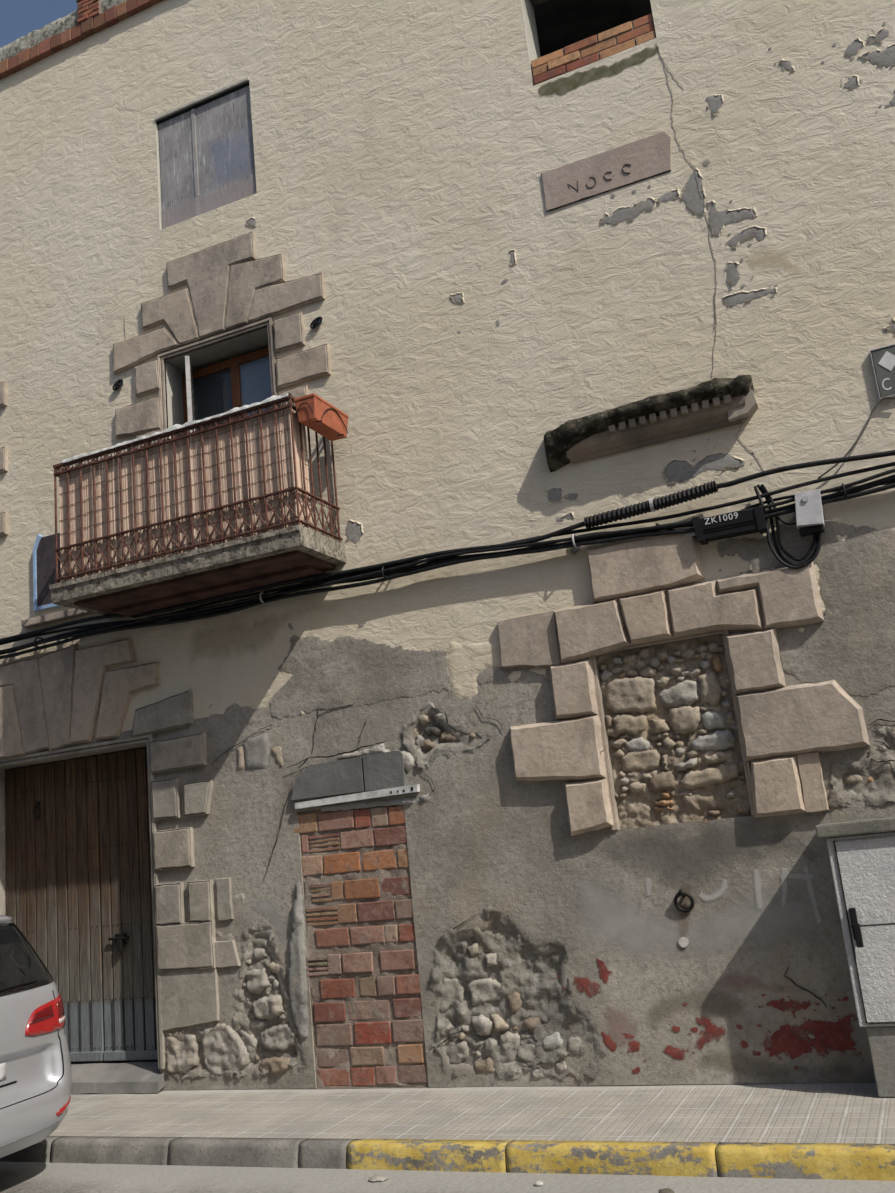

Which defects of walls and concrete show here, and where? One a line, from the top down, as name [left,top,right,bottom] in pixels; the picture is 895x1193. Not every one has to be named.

peeling [774,59,795,74]
peeling [840,75,863,93]
peeling [832,22,895,69]
peeling [599,159,778,308]
peeling [662,438,754,486]
peeling [201,619,492,770]
peeling [476,666,548,684]
crack [262,705,385,881]
flaking render [825,724,895,808]
flaking render [164,893,308,1081]
flaking render [429,902,646,1084]
peeling [663,994,862,1069]